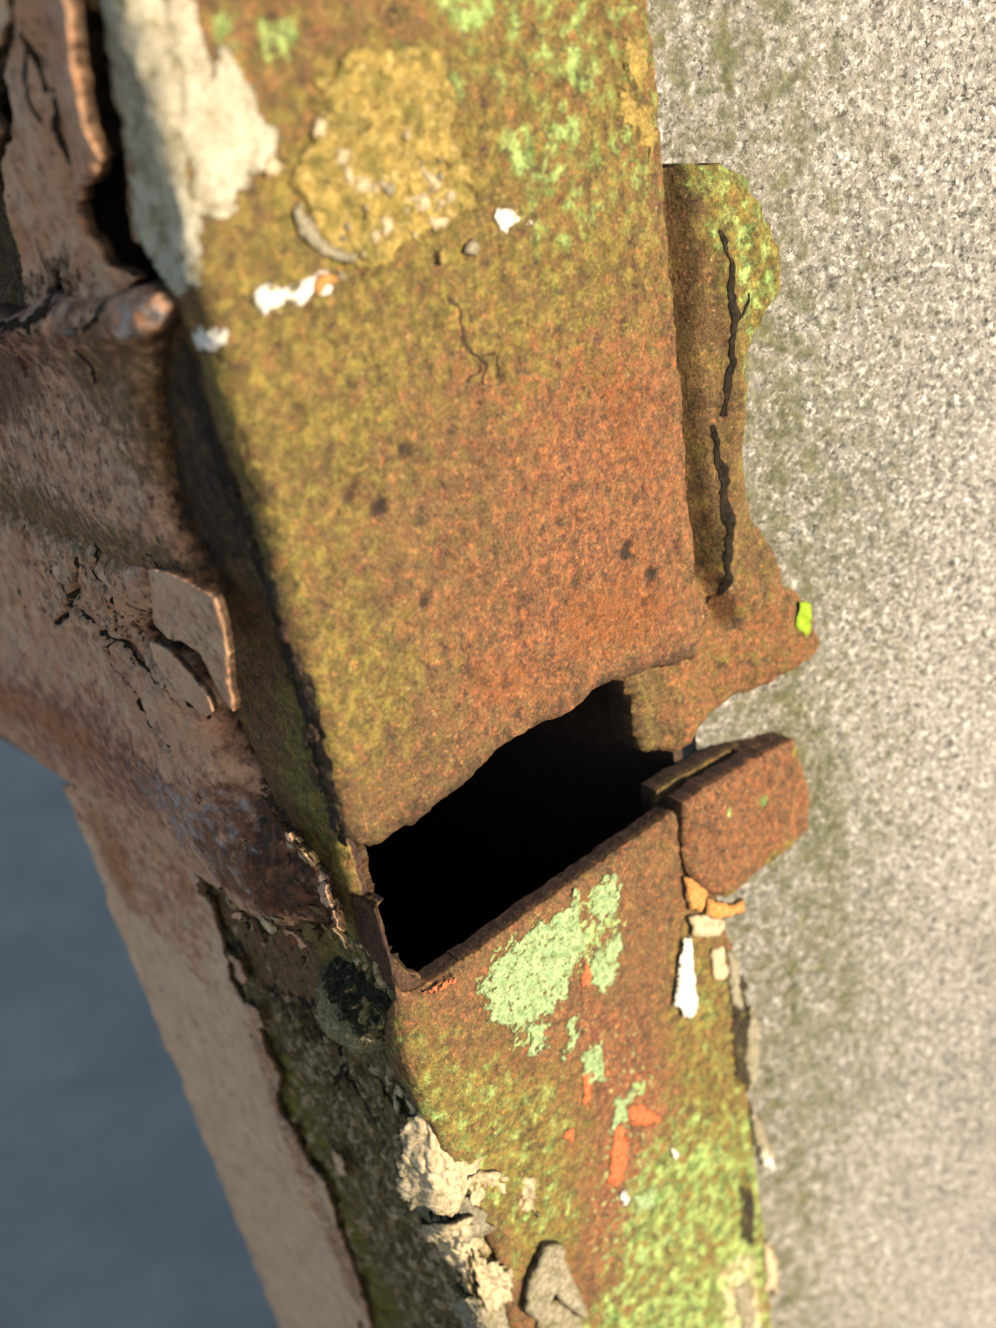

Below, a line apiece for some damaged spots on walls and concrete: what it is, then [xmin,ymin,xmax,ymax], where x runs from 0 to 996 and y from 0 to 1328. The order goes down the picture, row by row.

peeling [0,0,281,307]
crack [705,229,750,604]
peeling [148,566,240,717]
peeling [226,949,250,984]
rust [192,777,350,968]
peeling [332,1147,349,1176]
spalling [393,1082,541,1328]